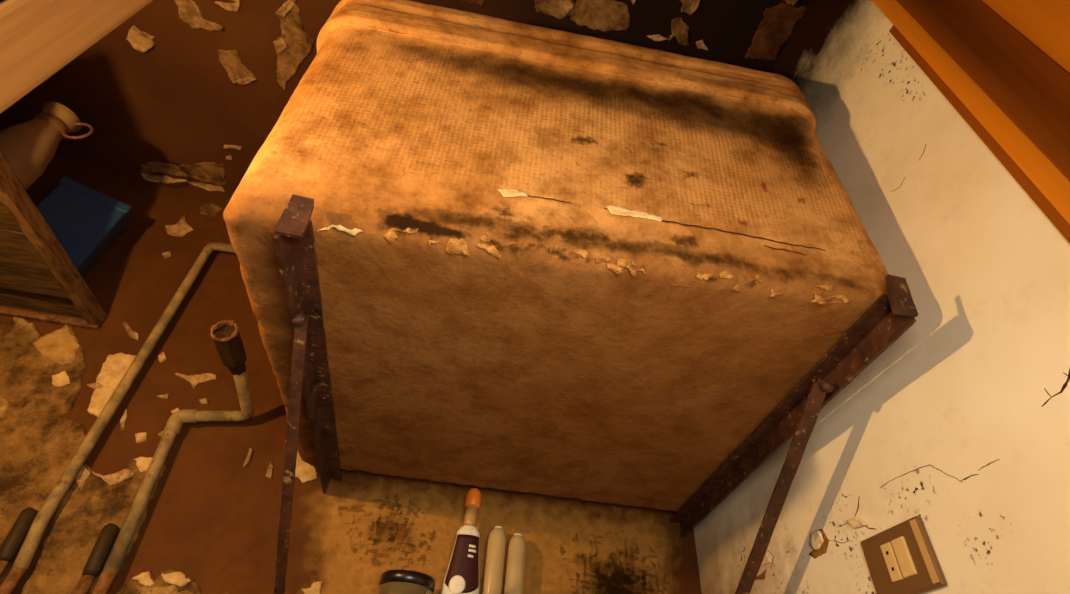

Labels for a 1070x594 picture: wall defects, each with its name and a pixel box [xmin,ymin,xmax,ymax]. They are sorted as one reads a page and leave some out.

peeling [126,25,155,52]
peeling [174,0,224,31]
peeling [273,0,315,90]
peeling [535,0,636,32]
peeling [647,0,708,50]
peeling [745,0,806,62]
peeling [218,49,257,85]
peeling [175,373,217,404]
crack [1041,369,1070,407]
spalling [0,316,201,594]
peeling [295,451,317,483]
crack [840,459,1000,529]